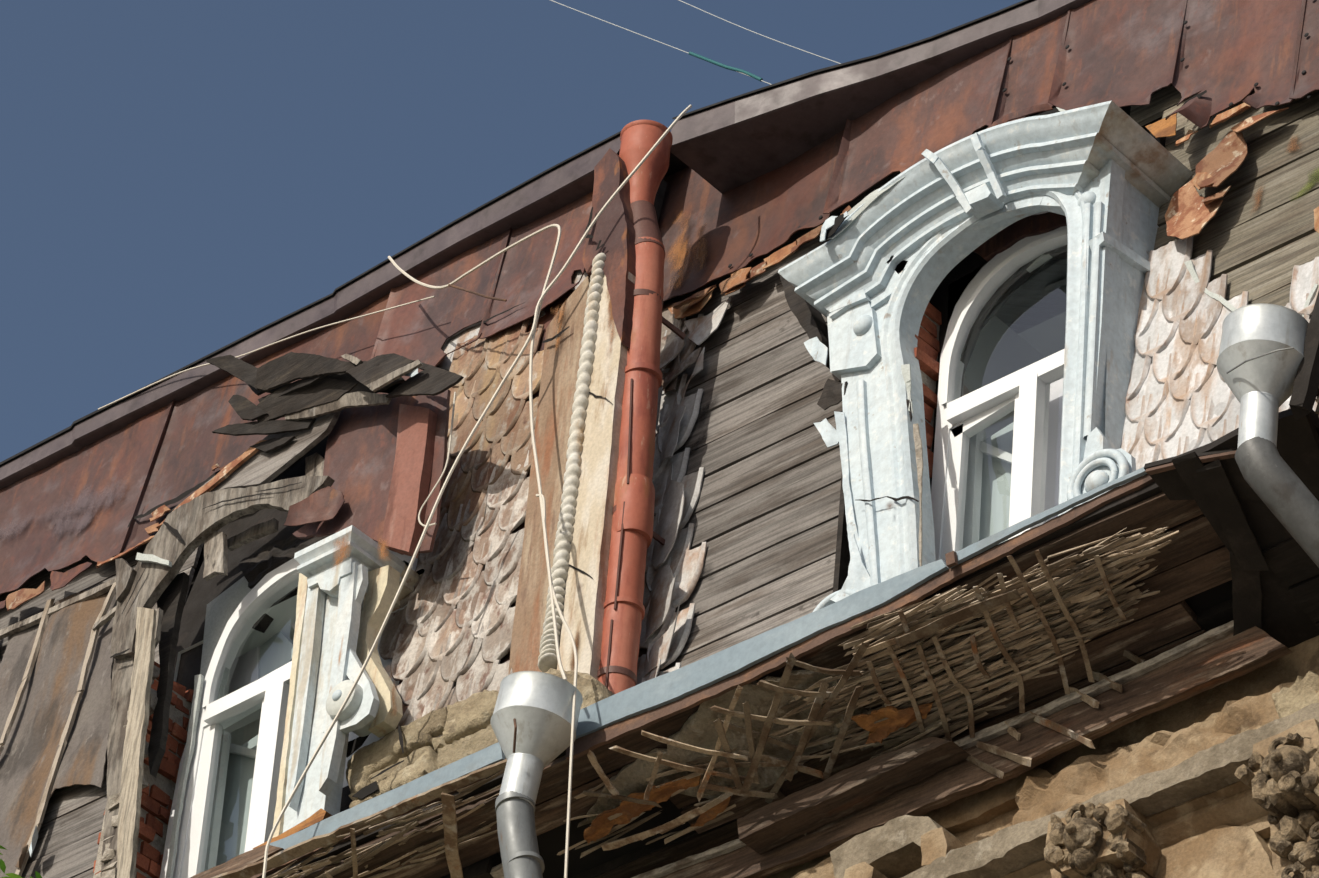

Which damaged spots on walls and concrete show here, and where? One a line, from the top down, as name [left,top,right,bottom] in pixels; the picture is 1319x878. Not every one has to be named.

peeling [1165,103,1289,240]
rust [670,214,707,287]
peeling [673,206,852,309]
peeling [2,487,122,535]
peeling [0,505,171,611]
crack [858,496,919,508]
spalling [141,665,160,796]
spalling [100,793,120,878]